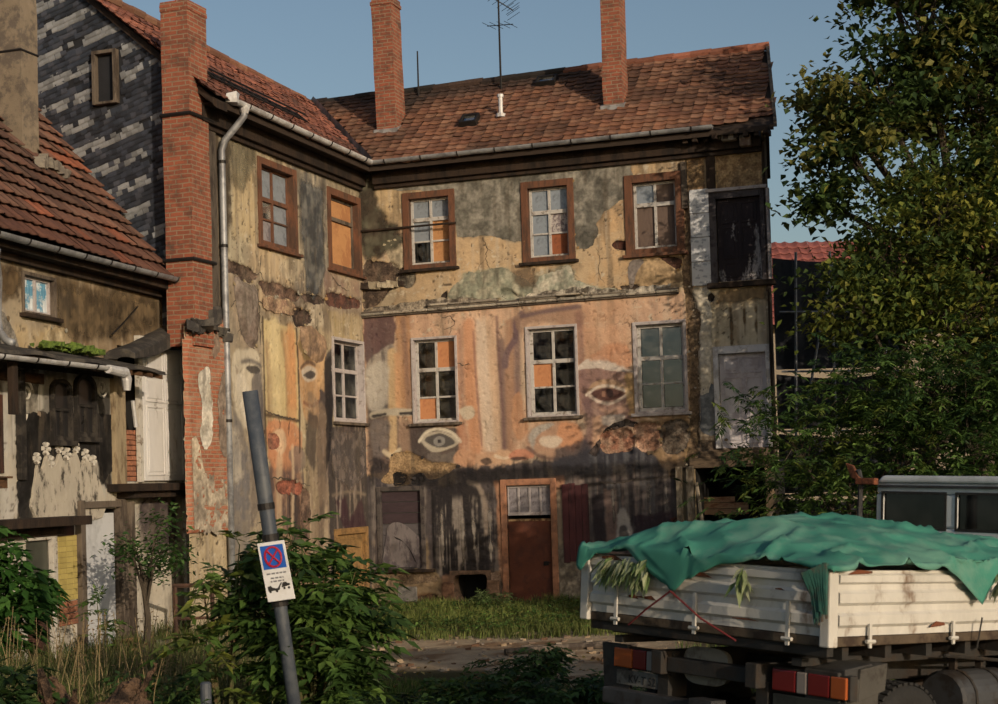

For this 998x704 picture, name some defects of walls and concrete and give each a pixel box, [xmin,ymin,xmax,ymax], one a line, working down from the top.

peeling [382,165,633,249]
peeling [228,239,671,327]
spalling [589,153,773,466]
flaking render [182,321,229,536]
flaking render [268,433,280,450]
leakage [400,462,687,486]
leakage [461,517,476,568]